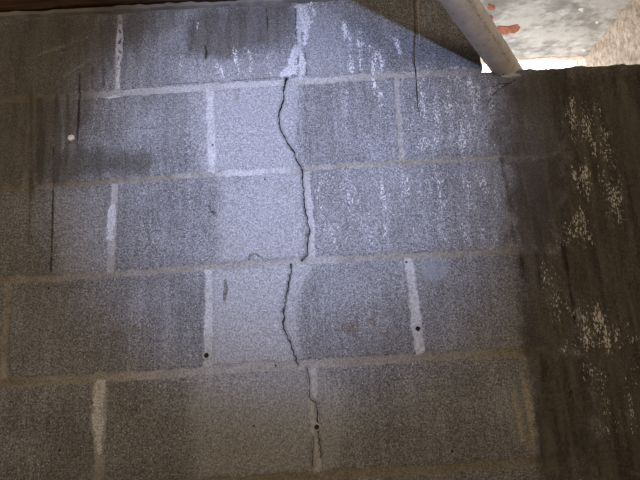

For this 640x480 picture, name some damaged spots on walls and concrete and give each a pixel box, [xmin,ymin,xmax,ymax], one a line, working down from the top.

leakage [342,22,385,108]
leakage [408,58,501,158]
crack [169,2,321,467]
leakage [315,165,503,252]
leakage [497,68,640,480]